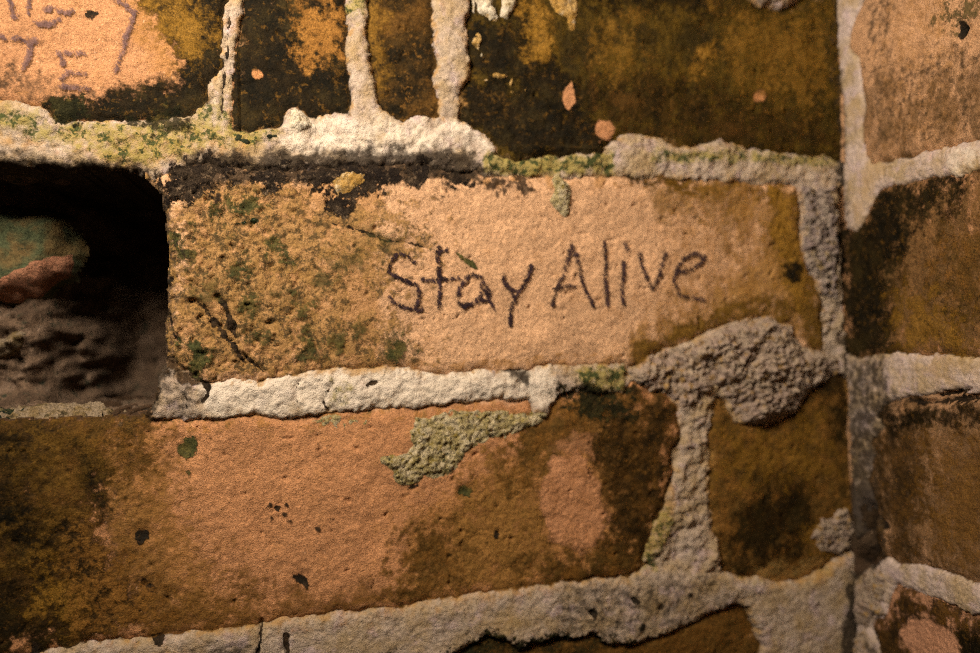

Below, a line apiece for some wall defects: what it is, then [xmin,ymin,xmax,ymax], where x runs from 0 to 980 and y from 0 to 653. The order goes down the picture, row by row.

leakage [458,0,842,162]
spalling [0,170,206,436]
leakage [837,169,980,358]
leakage [375,379,680,608]